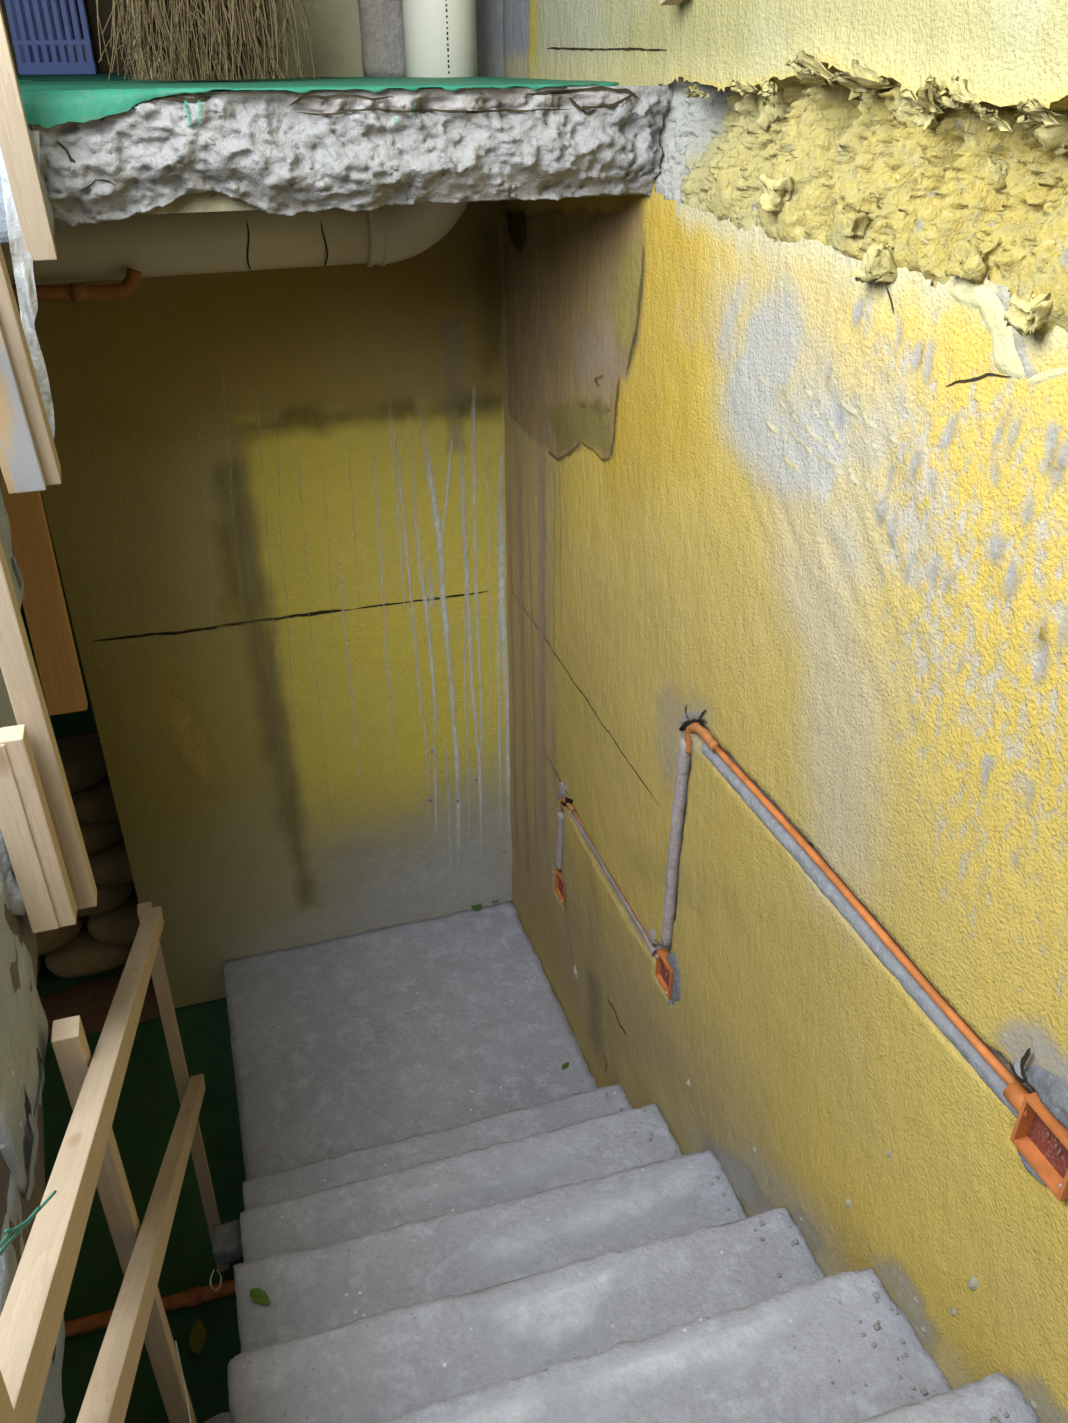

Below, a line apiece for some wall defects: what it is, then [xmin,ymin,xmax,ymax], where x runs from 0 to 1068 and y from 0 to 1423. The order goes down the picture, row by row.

crack [546,45,665,53]
spalling [31,50,1068,387]
peeling [1048,426,1068,483]
crack [91,589,660,806]
damp [384,442,545,891]
peeling [991,537,1015,593]